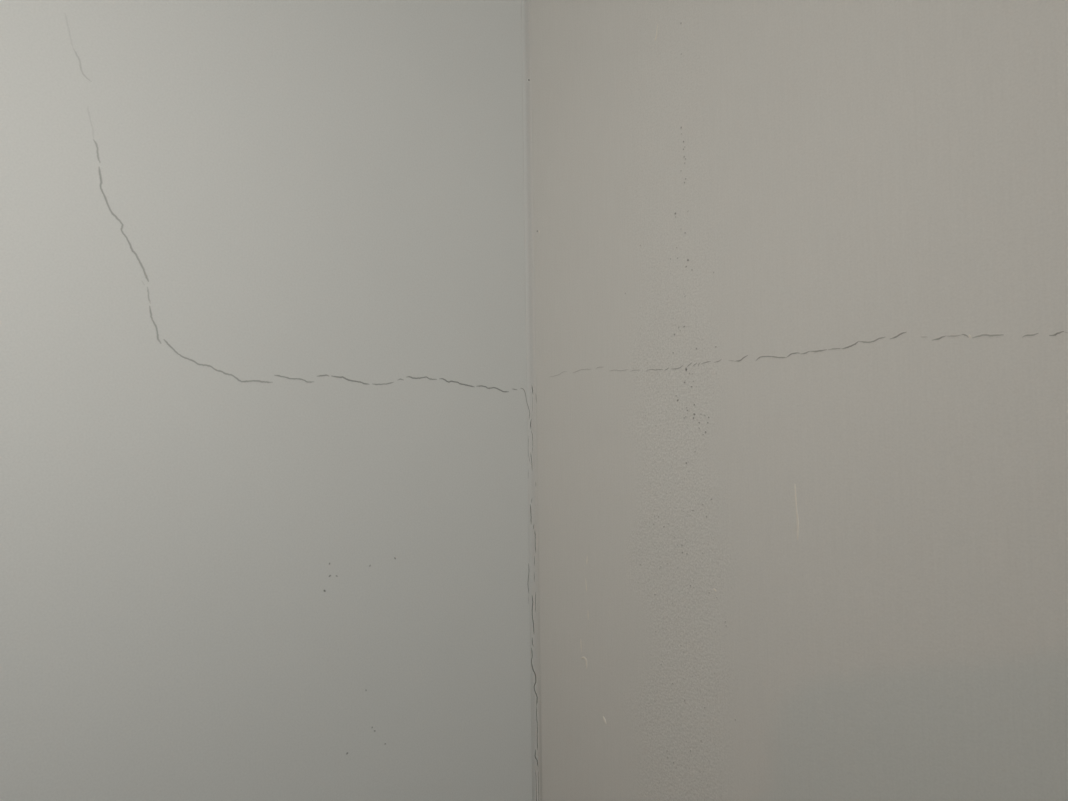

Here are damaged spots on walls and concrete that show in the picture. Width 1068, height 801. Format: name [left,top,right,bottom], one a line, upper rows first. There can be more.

crack [85,106,1068,801]